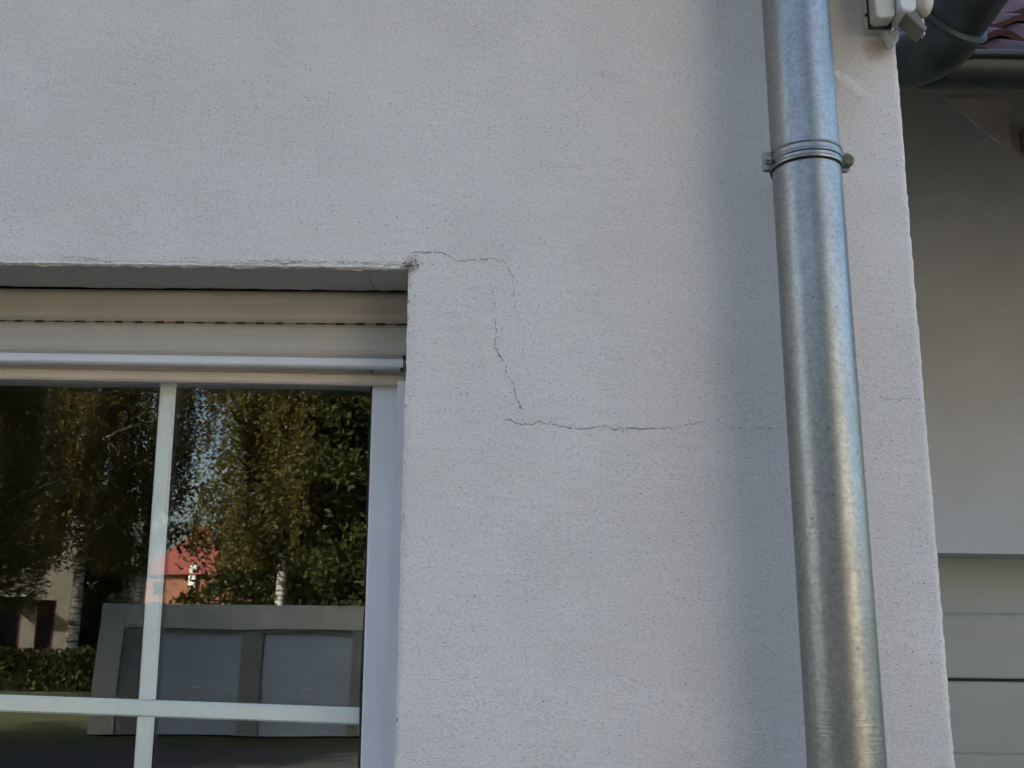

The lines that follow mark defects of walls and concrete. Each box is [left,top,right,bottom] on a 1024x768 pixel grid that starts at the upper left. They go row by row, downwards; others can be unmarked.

crack [412,251,781,430]